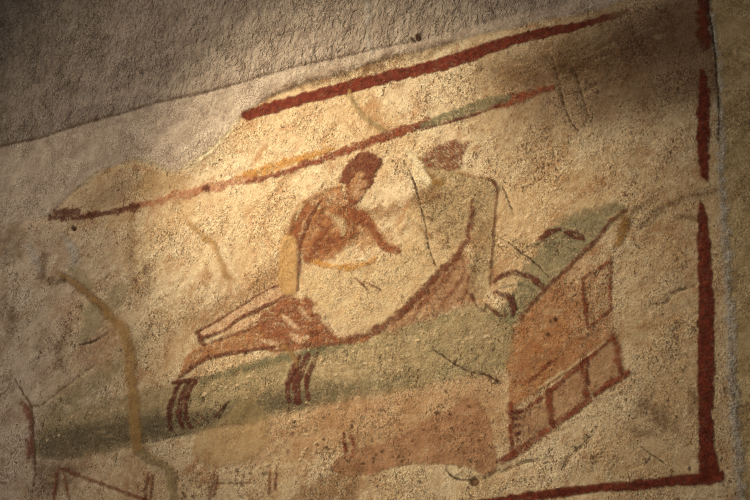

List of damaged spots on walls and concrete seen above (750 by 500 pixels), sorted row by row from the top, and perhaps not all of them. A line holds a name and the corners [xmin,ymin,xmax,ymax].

crack [404,148,440,266]
crack [433,349,494,379]